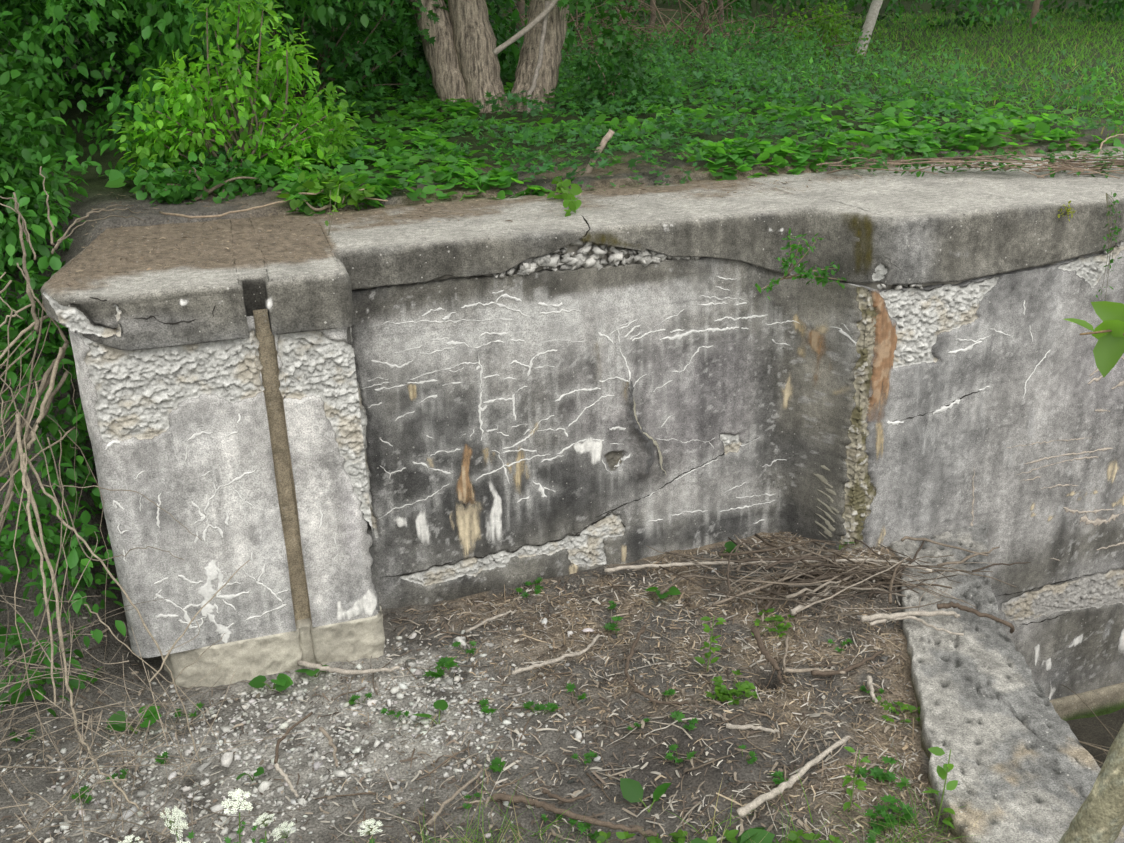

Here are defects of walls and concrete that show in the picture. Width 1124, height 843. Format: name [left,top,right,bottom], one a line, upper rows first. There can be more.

spalling [492,238,700,279]
spalling [43,292,264,443]
crack [154,414,288,643]
spalling [277,326,379,538]
leakage [396,512,429,543]
corrosion [456,445,480,555]
leakage [507,451,556,497]
crack [361,276,798,533]
crack [381,437,785,578]
leakage [783,378,792,407]
corrosion [867,291,897,454]
spalling [812,263,999,548]